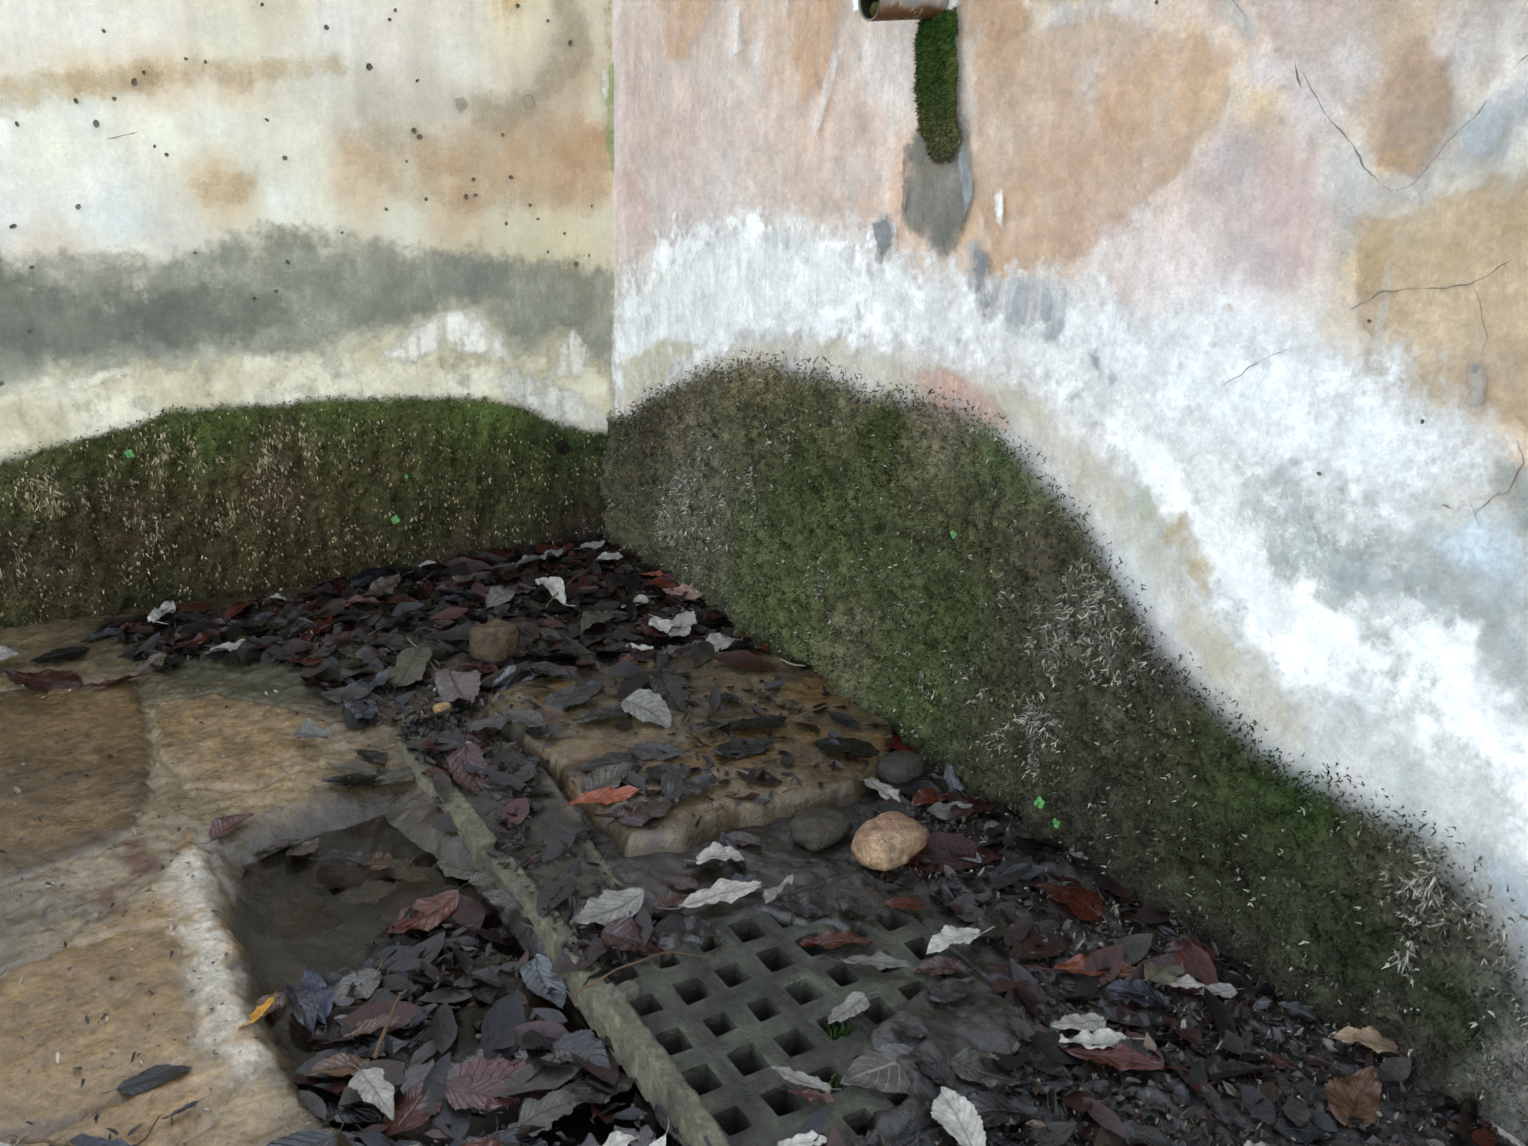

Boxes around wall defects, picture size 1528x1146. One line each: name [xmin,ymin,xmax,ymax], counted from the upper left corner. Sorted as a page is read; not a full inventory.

water stain [0,117,1528,937]
crack [1295,64,1489,193]